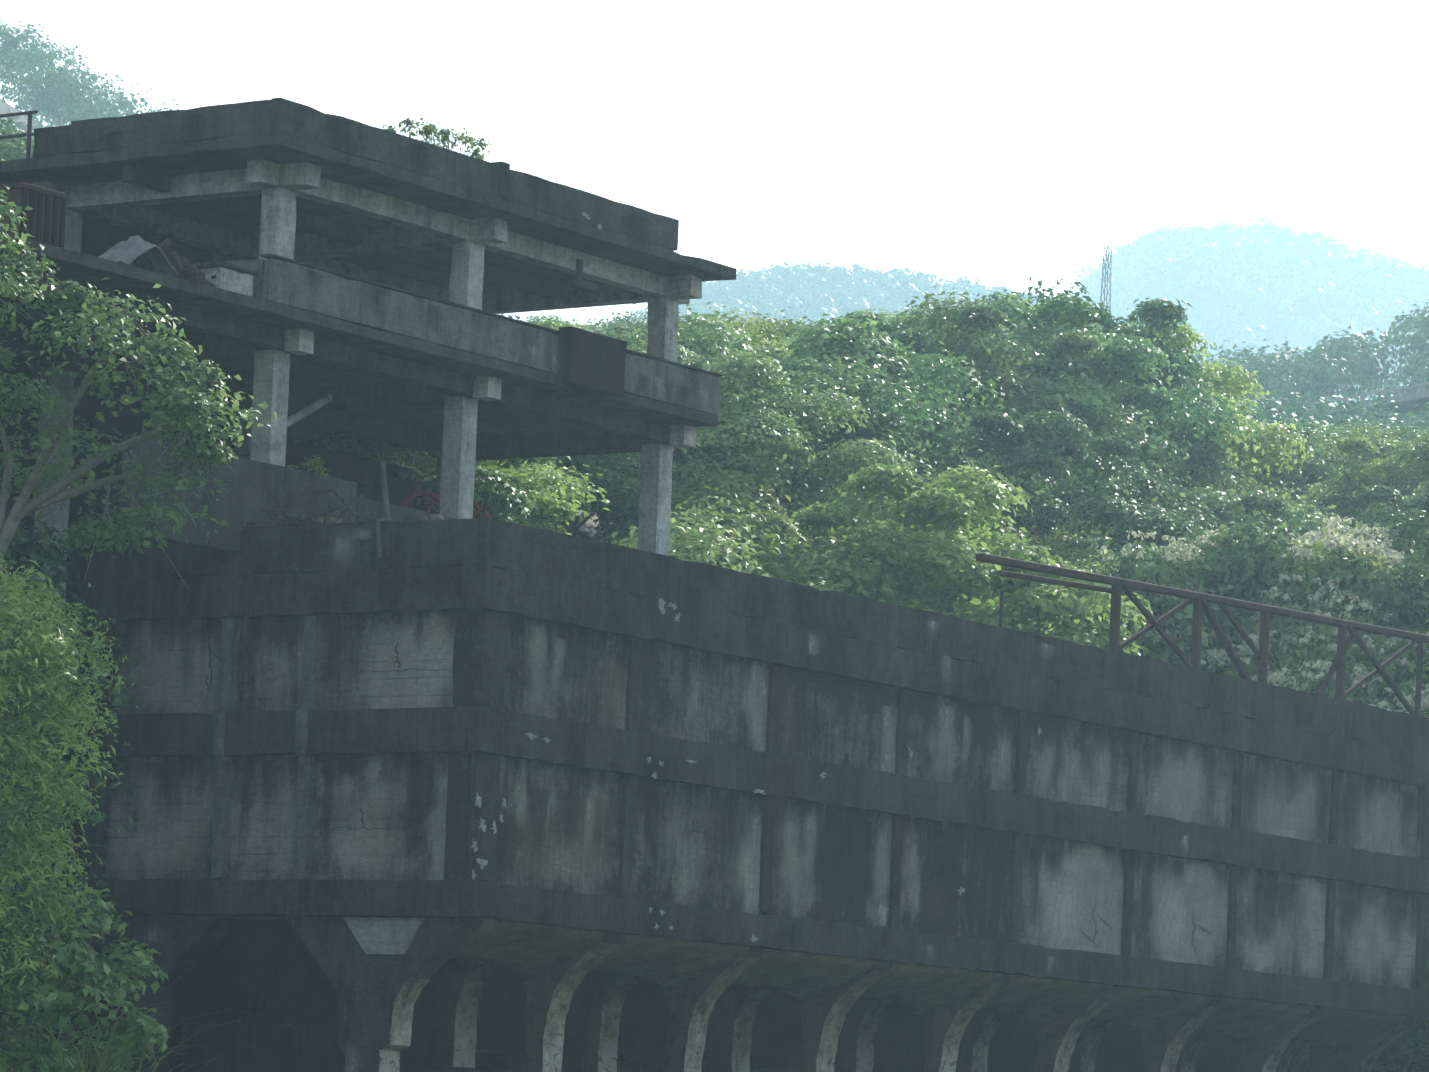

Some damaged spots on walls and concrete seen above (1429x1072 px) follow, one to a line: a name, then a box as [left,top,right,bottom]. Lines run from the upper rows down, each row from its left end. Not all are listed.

spalling [658,598,680,623]
crack [361,643,442,672]
spalling [470,793,506,880]